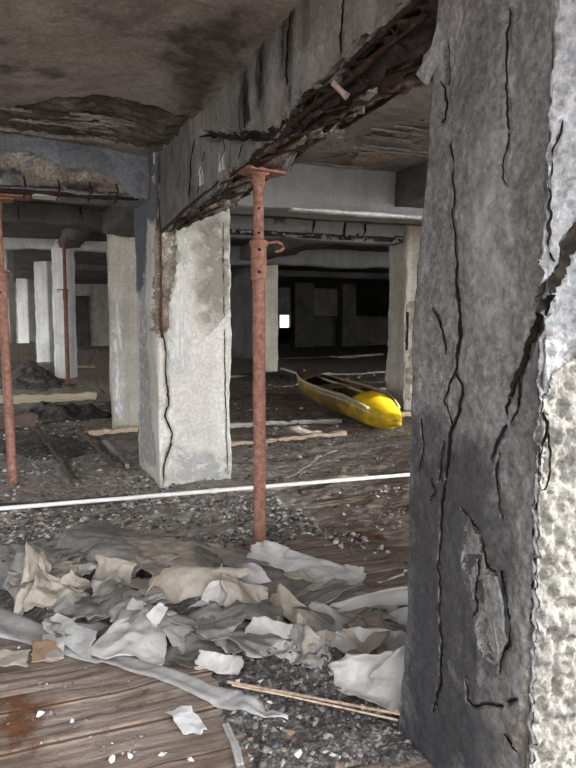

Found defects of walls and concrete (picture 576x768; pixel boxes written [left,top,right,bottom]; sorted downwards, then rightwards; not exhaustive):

spalling [0,150,139,204]
spalling [0,94,191,149]
leakage [165,14,243,109]
leakage [239,8,324,127]
spalling [149,0,451,338]
crack [326,81,448,158]
crack [502,8,511,185]
crack [163,335,173,483]
crack [418,143,516,712]
crack [491,120,576,625]
spalling [461,516,512,665]
spalling [510,358,576,768]